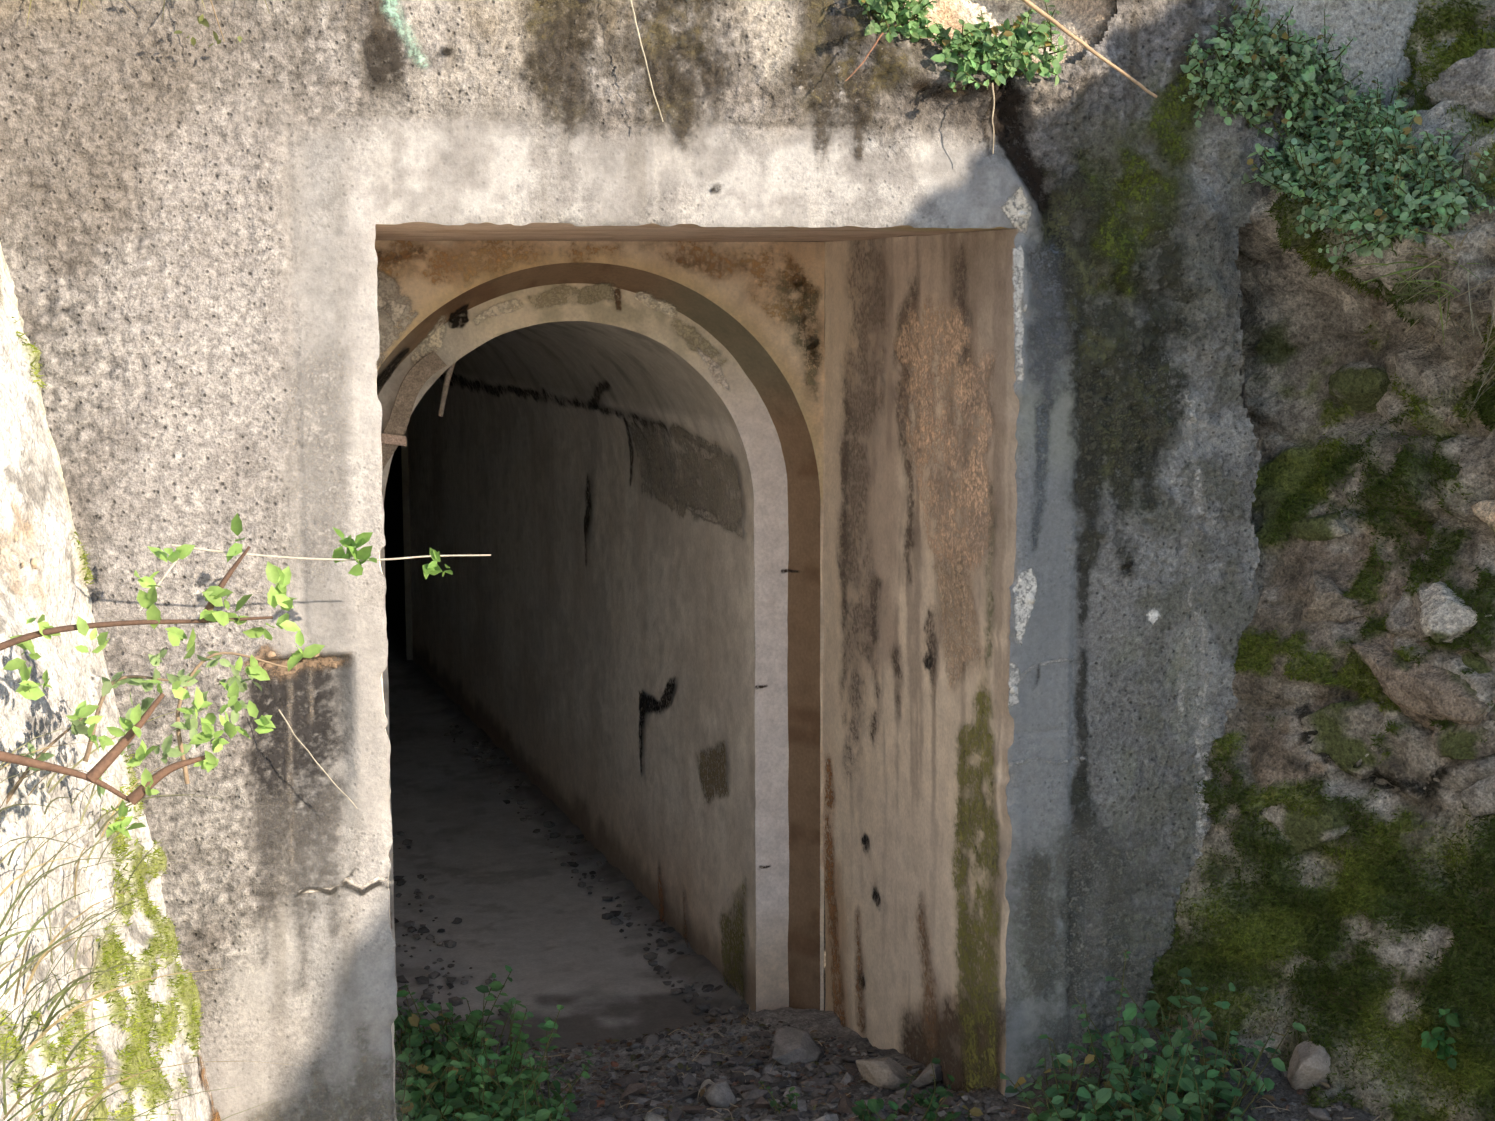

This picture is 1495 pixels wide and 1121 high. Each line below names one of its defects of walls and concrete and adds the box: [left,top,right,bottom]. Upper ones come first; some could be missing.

damp [522,0,599,131]
damp [635,0,733,145]
damp [786,0,915,160]
peeling [376,270,417,367]
damp [1029,72,1210,633]
damp [1178,543,1212,859]
damp [248,662,342,946]
crack [297,873,389,896]